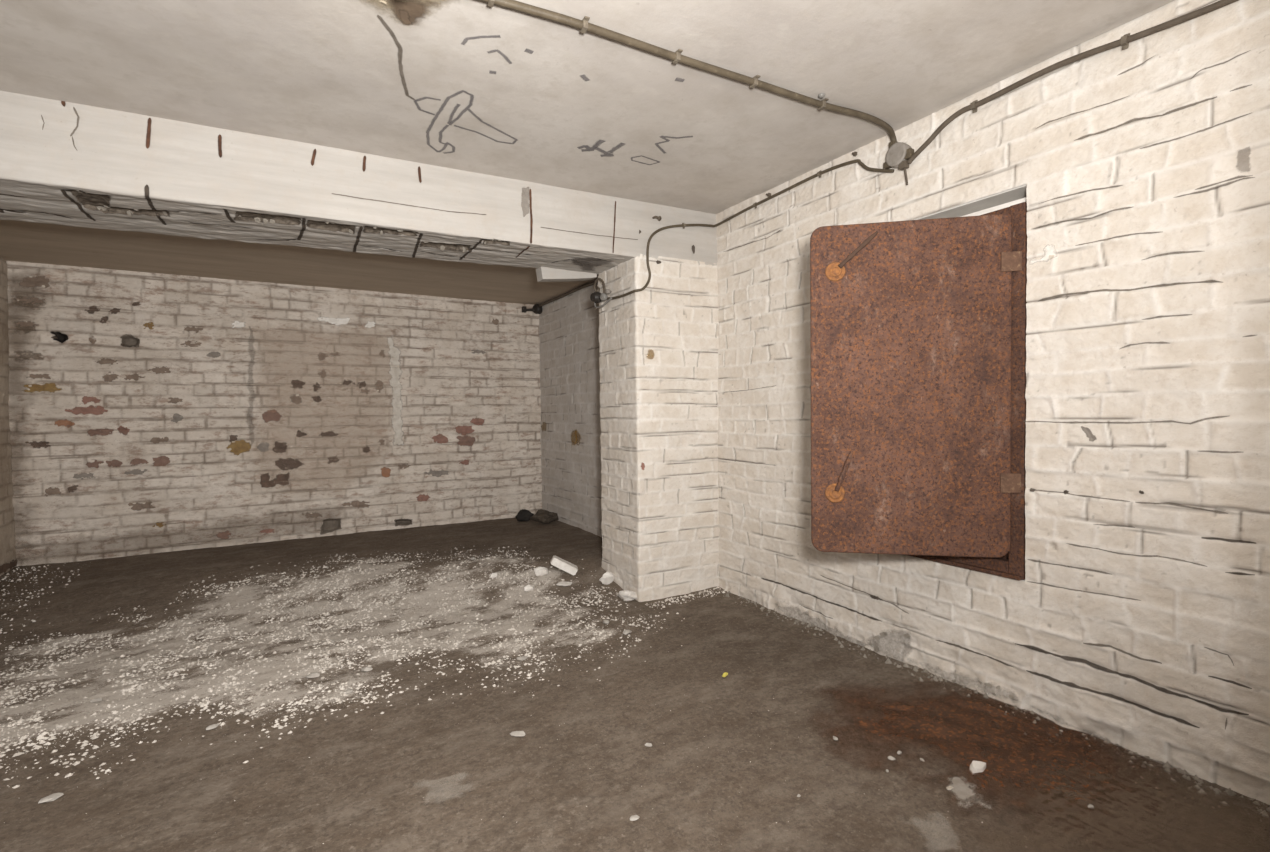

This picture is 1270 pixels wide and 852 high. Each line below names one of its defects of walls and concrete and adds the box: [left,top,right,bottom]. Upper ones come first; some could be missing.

crack [377,15,415,100]
crack [144,118,152,149]
crack [216,134,224,158]
crack [144,156,638,264]
spalling [51,331,68,343]
spalling [120,322,154,347]
peeling [54,396,130,436]
peeling [45,437,170,496]
peeling [227,430,338,487]
peeling [424,418,484,477]
spalling [302,501,370,535]
rust [827,689,1149,815]